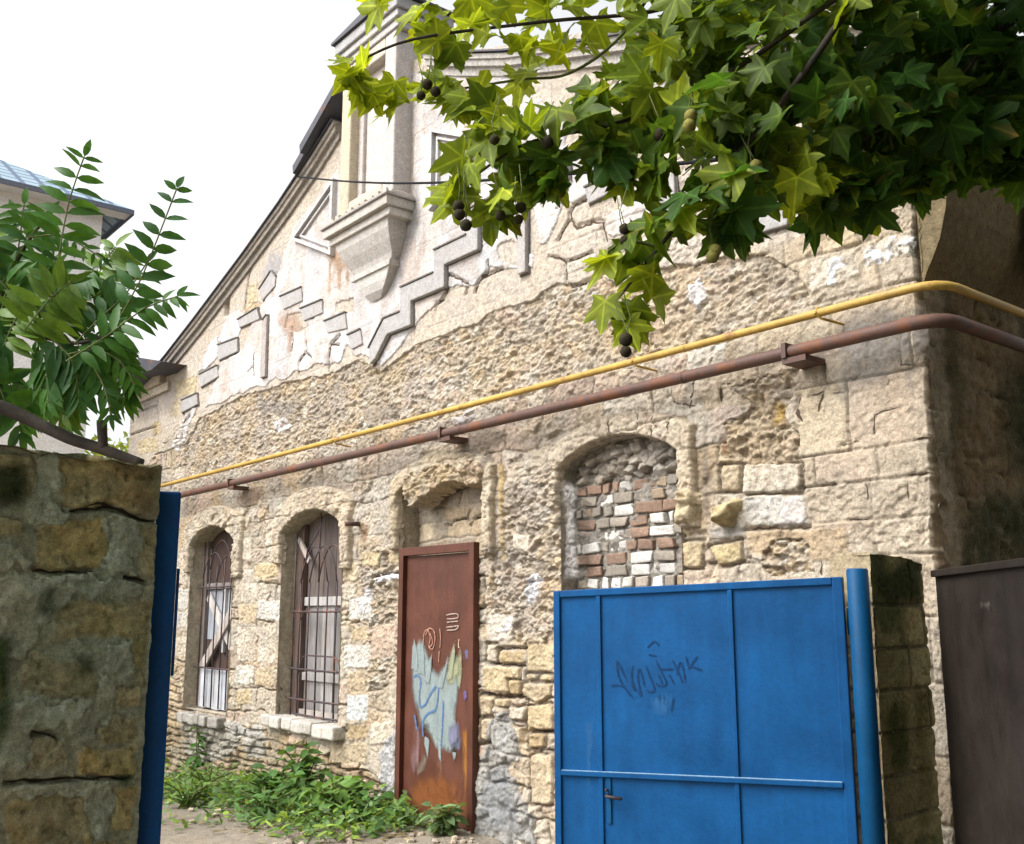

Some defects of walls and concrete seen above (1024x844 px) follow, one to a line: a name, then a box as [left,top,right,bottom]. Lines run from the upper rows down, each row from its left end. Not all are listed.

flaking render [866,235,917,266]
spalling [171,72,810,483]
flaking render [827,256,846,286]
crack [69,502,155,522]
crack [4,775,129,783]